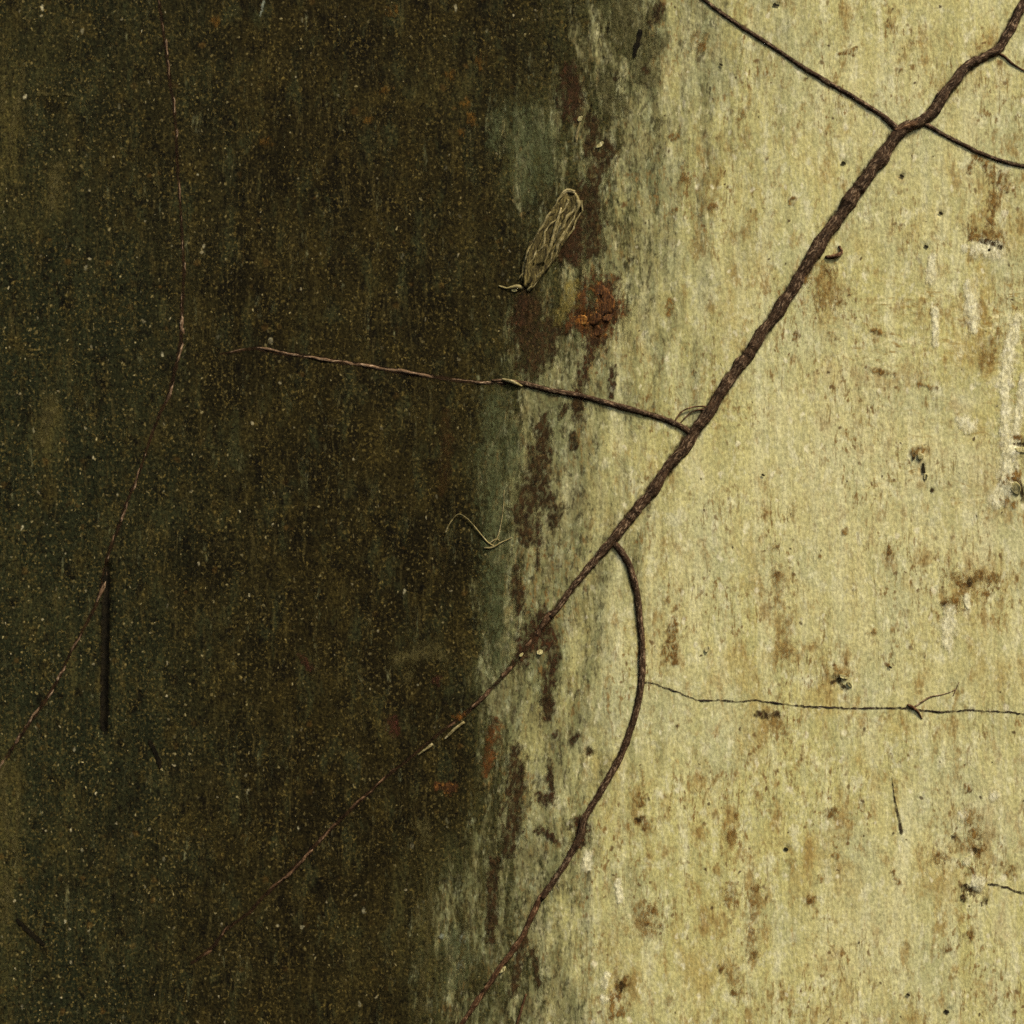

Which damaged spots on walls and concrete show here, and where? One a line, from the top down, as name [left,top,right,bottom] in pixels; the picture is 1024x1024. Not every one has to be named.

leakage [0,0,669,1024]
crack [459,894,542,1024]
corrosion [565,268,629,412]
crack [191,0,1024,964]